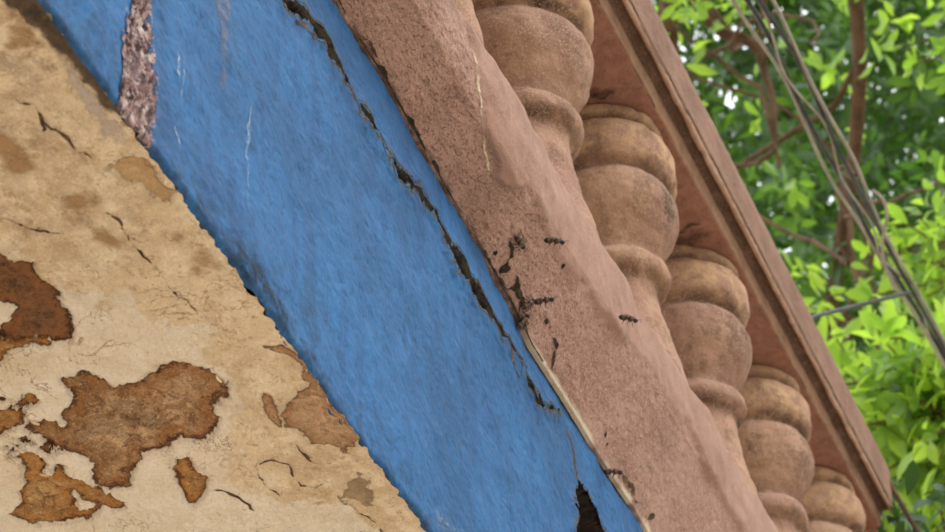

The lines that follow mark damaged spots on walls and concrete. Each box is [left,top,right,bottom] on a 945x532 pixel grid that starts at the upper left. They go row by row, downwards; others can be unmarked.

peeling [4,0,177,202]
crack [282,0,562,424]
spalling [0,330,52,361]
spalling [0,361,229,524]
spalling [262,345,359,454]
hole [568,434,605,532]